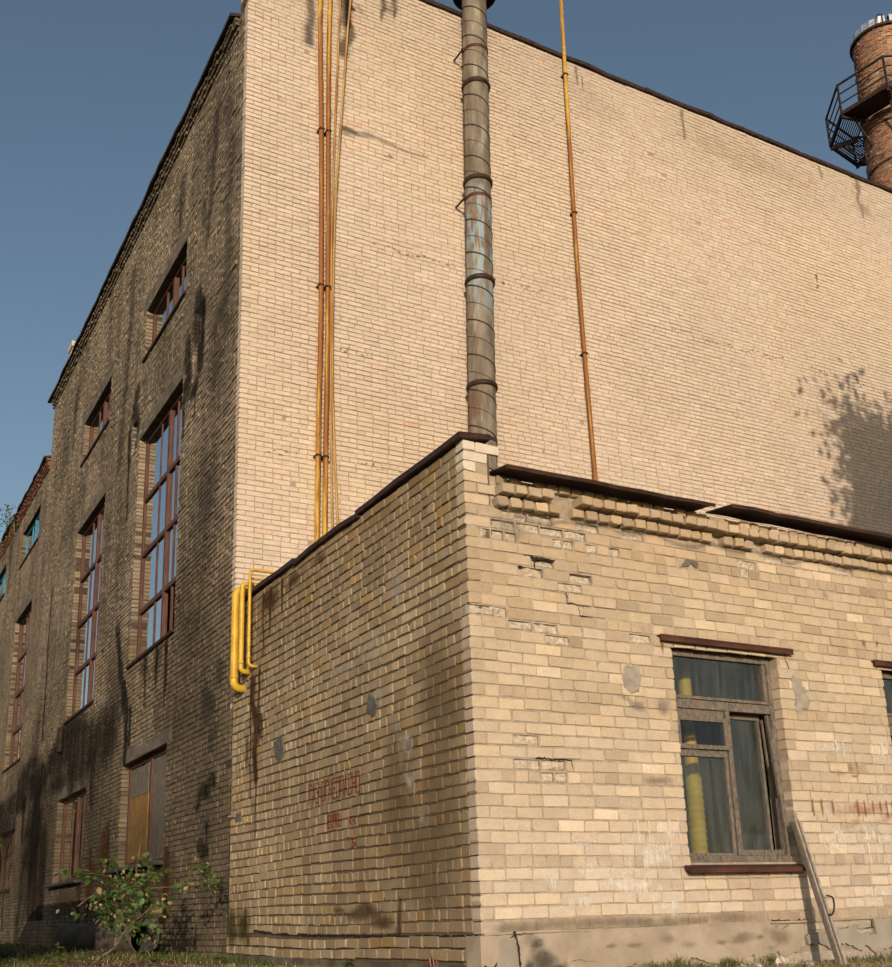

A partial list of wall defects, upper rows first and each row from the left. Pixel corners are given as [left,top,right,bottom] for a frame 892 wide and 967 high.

spalling [465,604,569,646]
spalling [514,759,566,783]